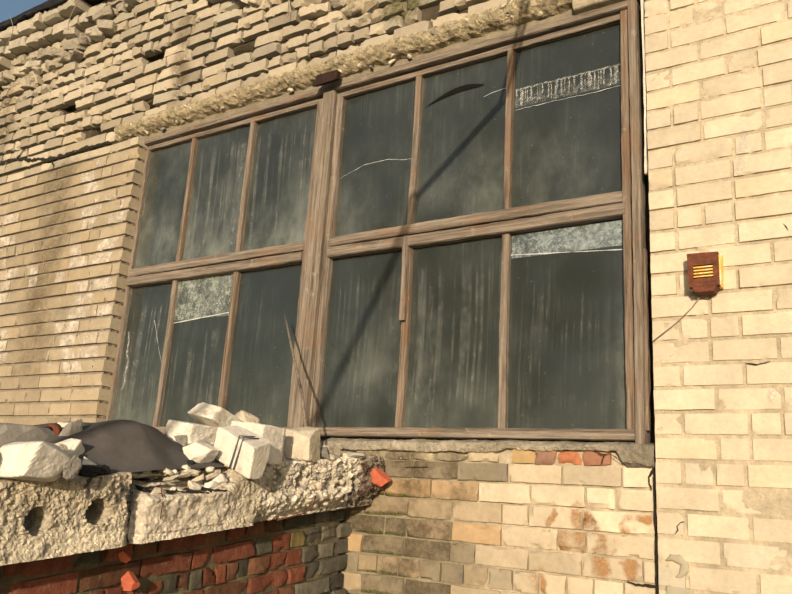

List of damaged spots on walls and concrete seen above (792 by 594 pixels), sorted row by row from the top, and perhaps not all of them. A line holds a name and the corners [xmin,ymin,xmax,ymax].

spalling [114,0,573,142]
damp [81,160,111,230]
damp [0,214,18,245]
damp [71,237,118,267]
damp [55,277,111,373]
spalling [257,463,353,521]
rust [572,509,610,576]
rust [621,559,637,580]